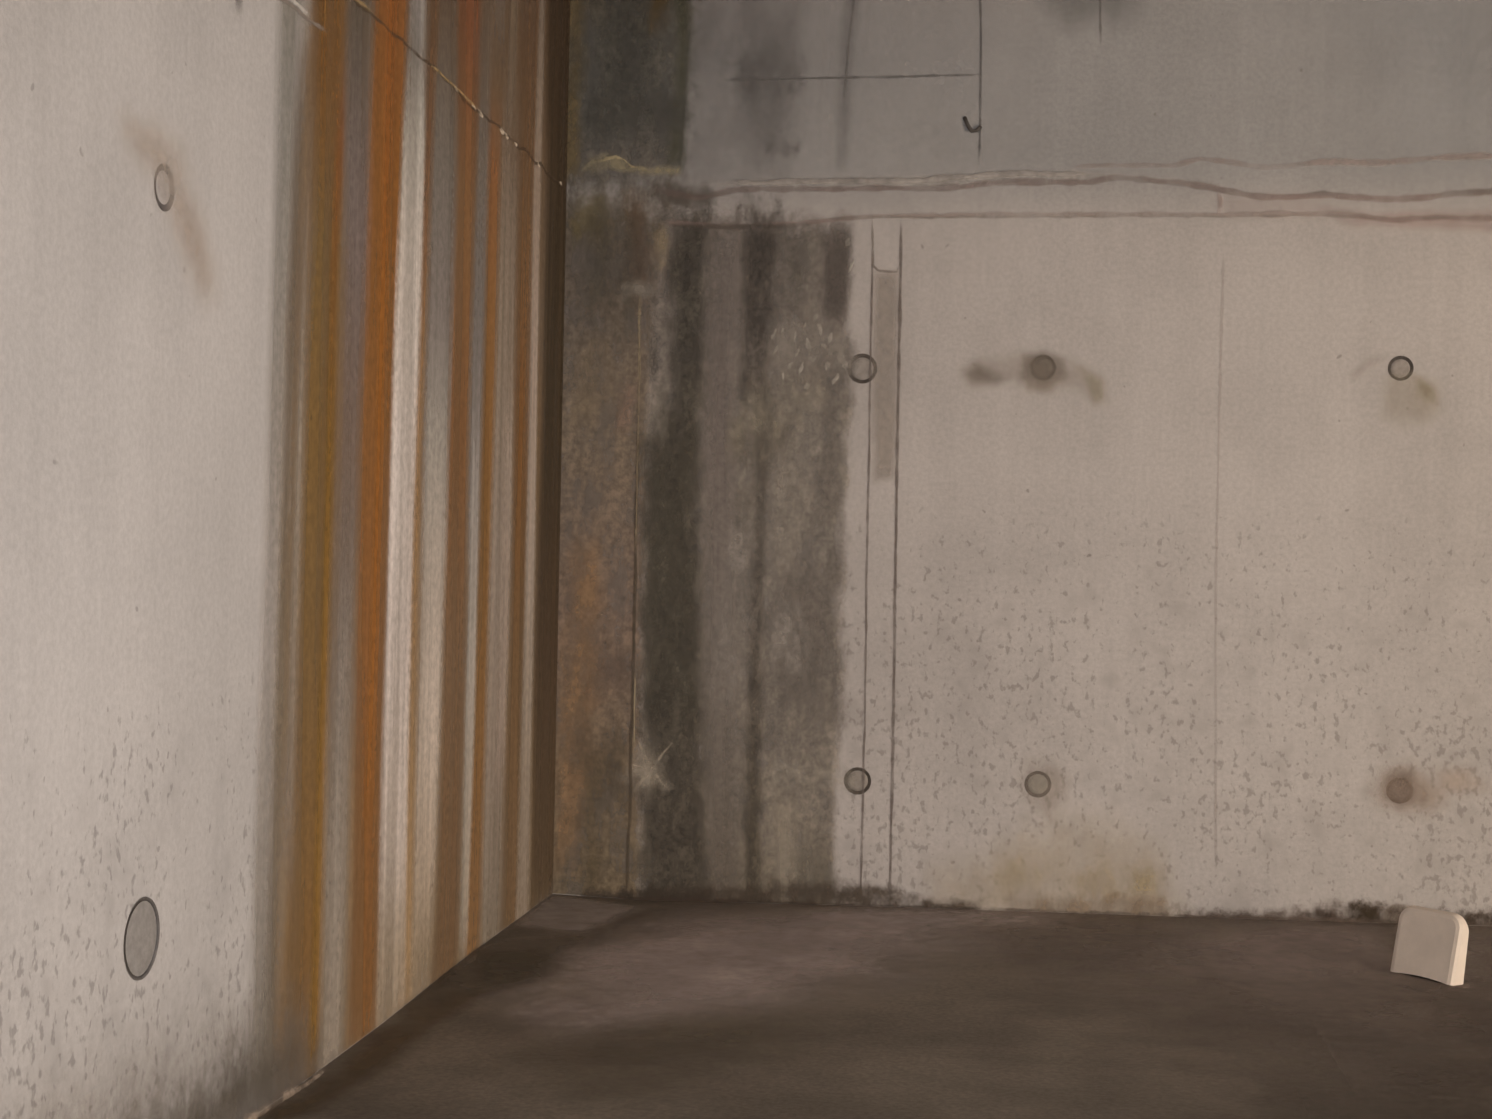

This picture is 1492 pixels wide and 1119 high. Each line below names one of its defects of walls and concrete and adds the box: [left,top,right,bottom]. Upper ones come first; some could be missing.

corrosion [268,0,669,1106]
water stain [567,0,977,910]